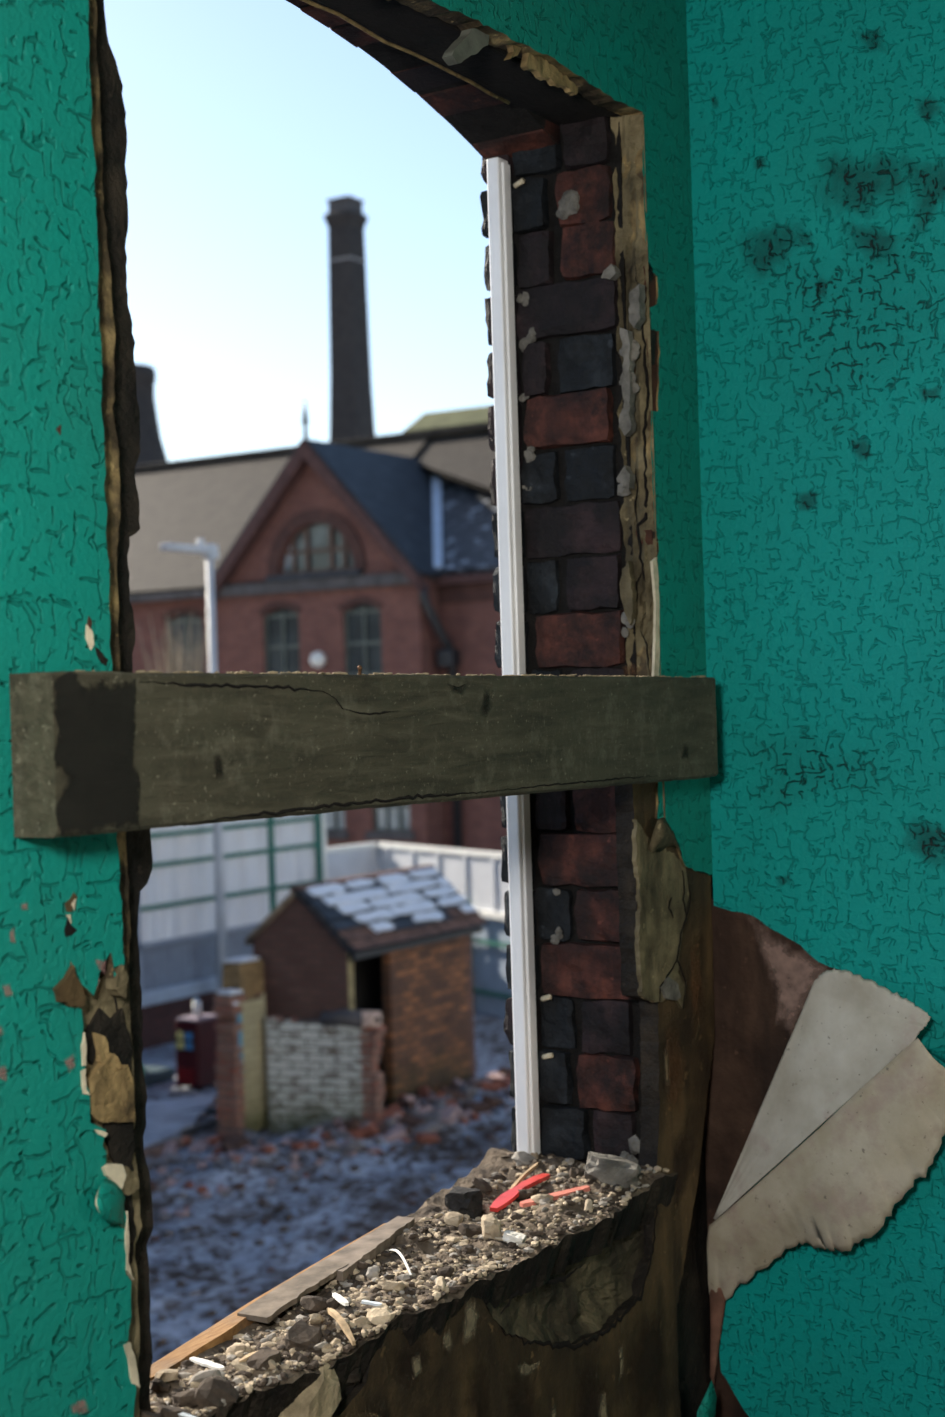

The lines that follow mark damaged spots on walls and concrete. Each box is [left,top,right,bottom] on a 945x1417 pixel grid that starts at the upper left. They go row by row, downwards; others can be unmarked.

spalling [503,44,578,96]
water stain [828,159,945,226]
water stain [789,230,920,381]
spalling [601,262,658,437]
spalling [619,465,635,489]
spalling [619,561,637,625]
water stain [776,744,848,803]
spalling [64,892,77,937]
spalling [213,1006,246,1139]
flaking render [279,782,715,1417]
spalling [53,961,142,1417]
peeling [189,1357,225,1370]